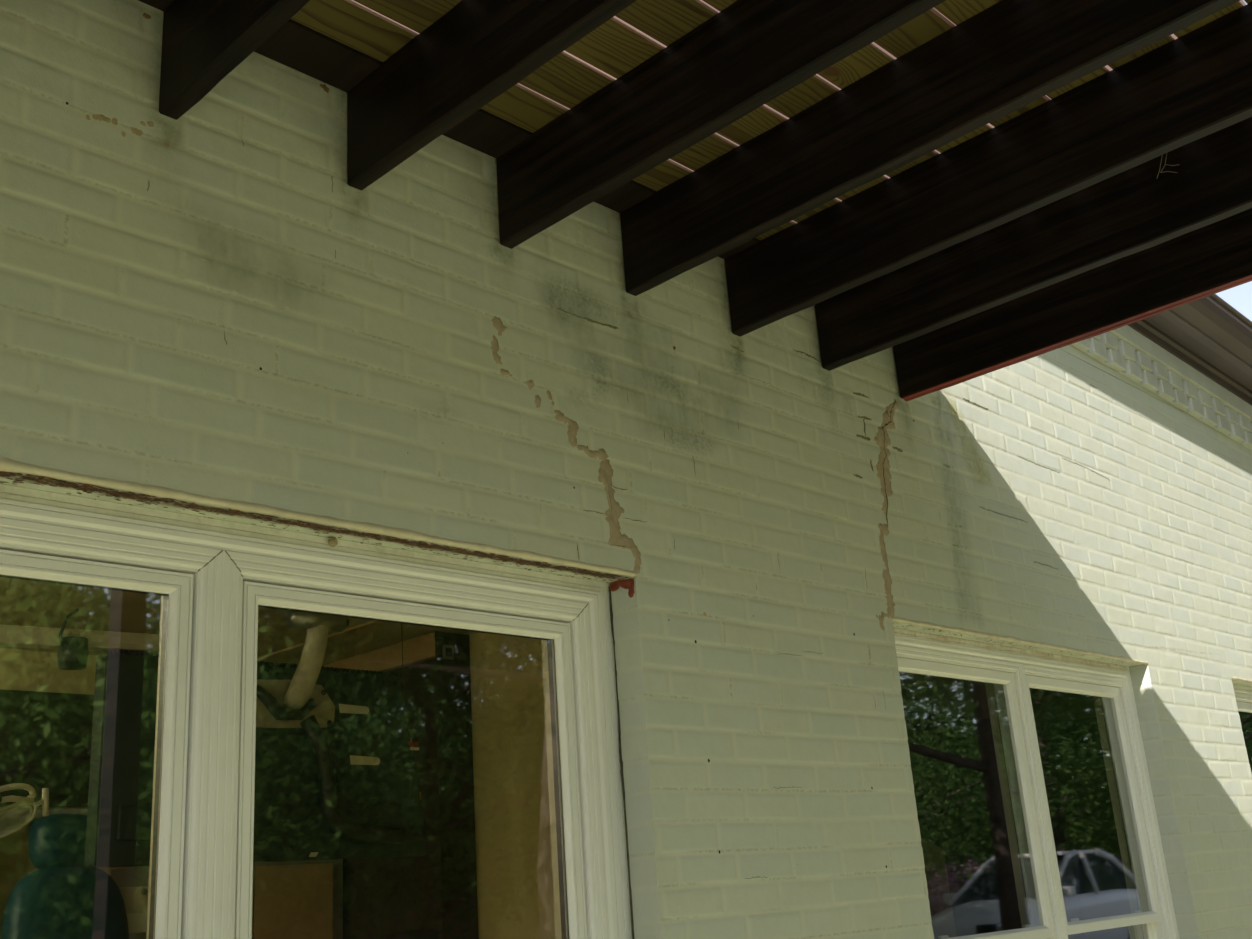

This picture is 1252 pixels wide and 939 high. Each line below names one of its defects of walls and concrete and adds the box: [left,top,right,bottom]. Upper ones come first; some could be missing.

corrosion [0,471,629,583]
crack [491,316,643,939]
crack [853,392,903,658]